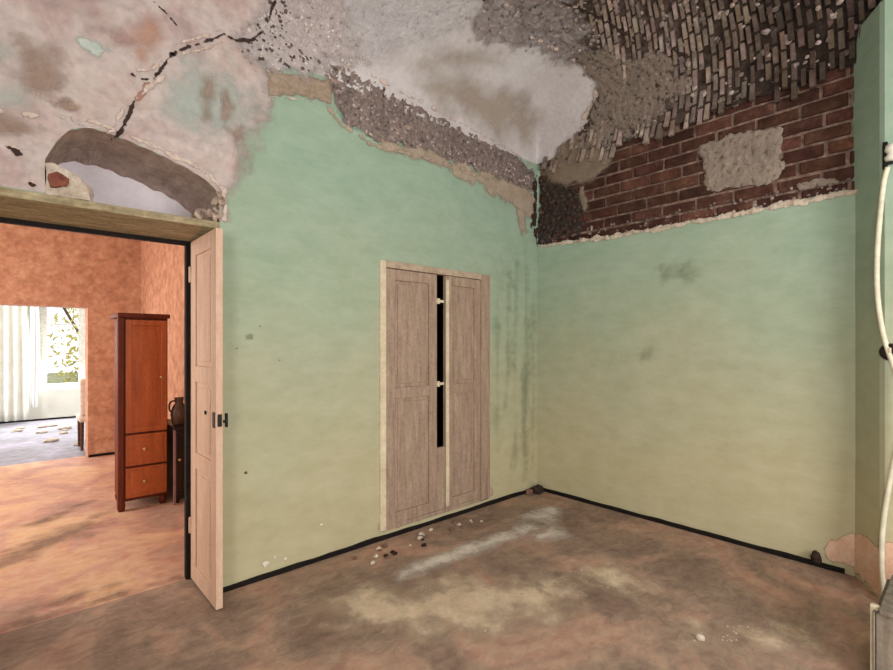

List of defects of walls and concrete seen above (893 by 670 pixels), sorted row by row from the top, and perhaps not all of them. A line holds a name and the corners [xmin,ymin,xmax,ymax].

crack [107,0,277,140]
peeling [0,0,883,247]
peeling [825,533,893,597]